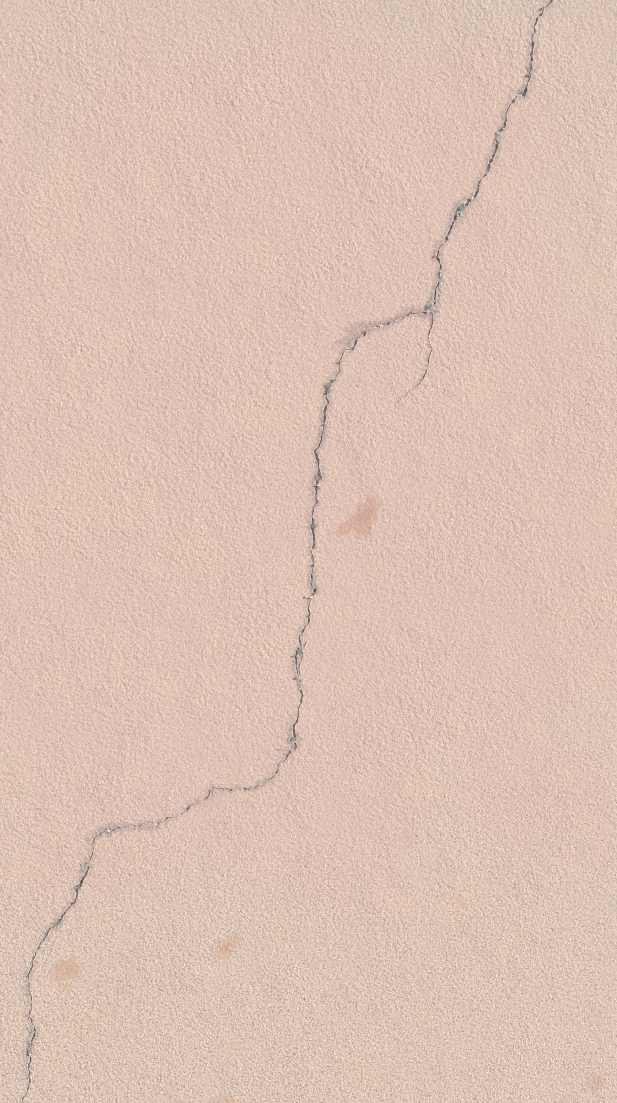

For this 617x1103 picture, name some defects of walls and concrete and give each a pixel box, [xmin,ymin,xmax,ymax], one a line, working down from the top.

crack [395,0,554,406]
crack [21,311,427,1103]